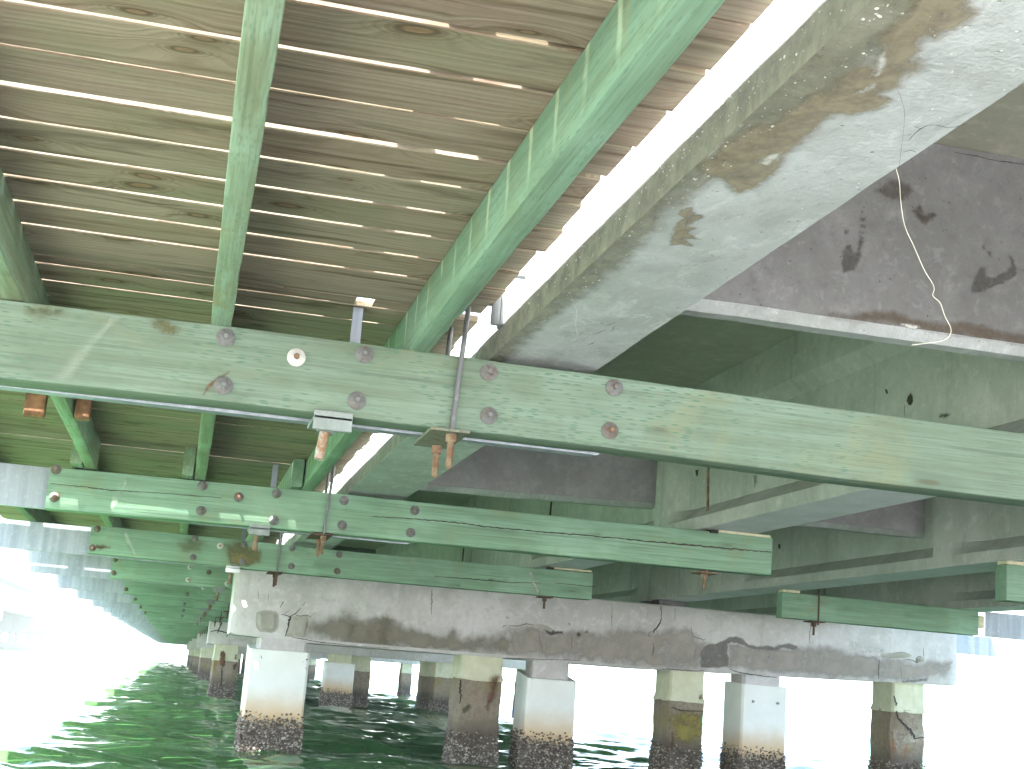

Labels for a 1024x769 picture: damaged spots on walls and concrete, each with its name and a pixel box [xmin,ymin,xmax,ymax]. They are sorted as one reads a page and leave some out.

leakage [701,0,976,193]
leakage [670,207,703,246]
leakage [914,206,936,223]
leakage [842,240,862,272]
leakage [972,258,1016,292]
crack [258,594,385,648]
leakage [309,616,950,682]
crack [648,606,706,672]
corrosion [486,677,498,710]
crack [878,648,928,740]